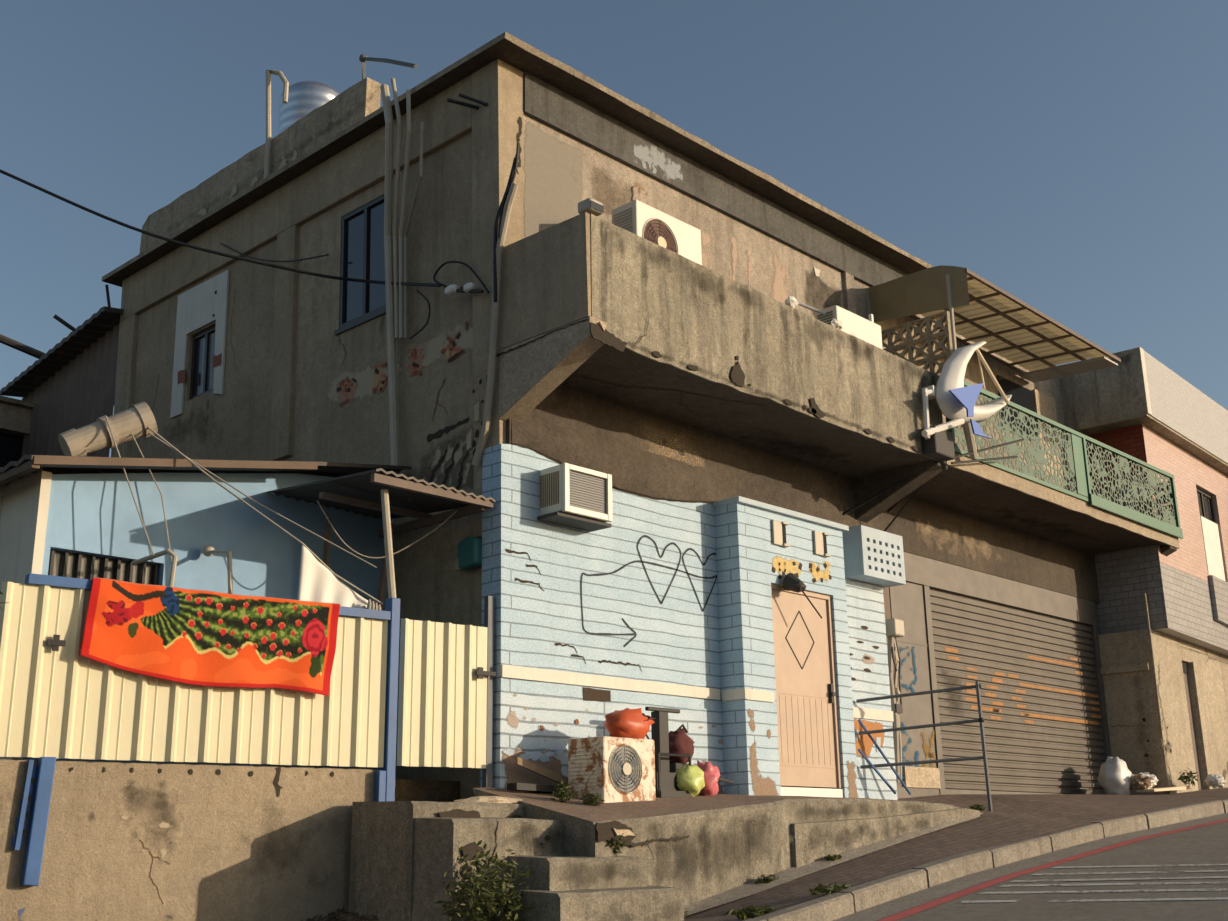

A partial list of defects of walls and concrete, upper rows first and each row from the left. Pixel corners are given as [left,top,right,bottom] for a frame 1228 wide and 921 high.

peeling [634,145,683,180]
leakage [807,267,840,314]
peeling [327,324,473,407]
peeling [507,694,558,731]
peeling [502,746,564,789]
peeling [748,709,778,796]
crack [139,839,170,904]